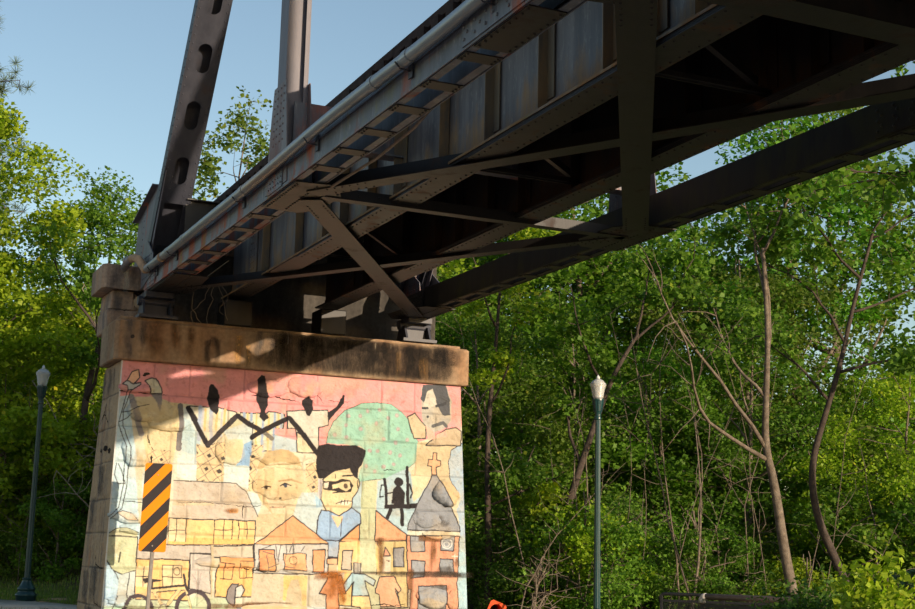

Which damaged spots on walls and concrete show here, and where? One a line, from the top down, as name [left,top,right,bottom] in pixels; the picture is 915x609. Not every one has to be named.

leakage [256,332,455,379]